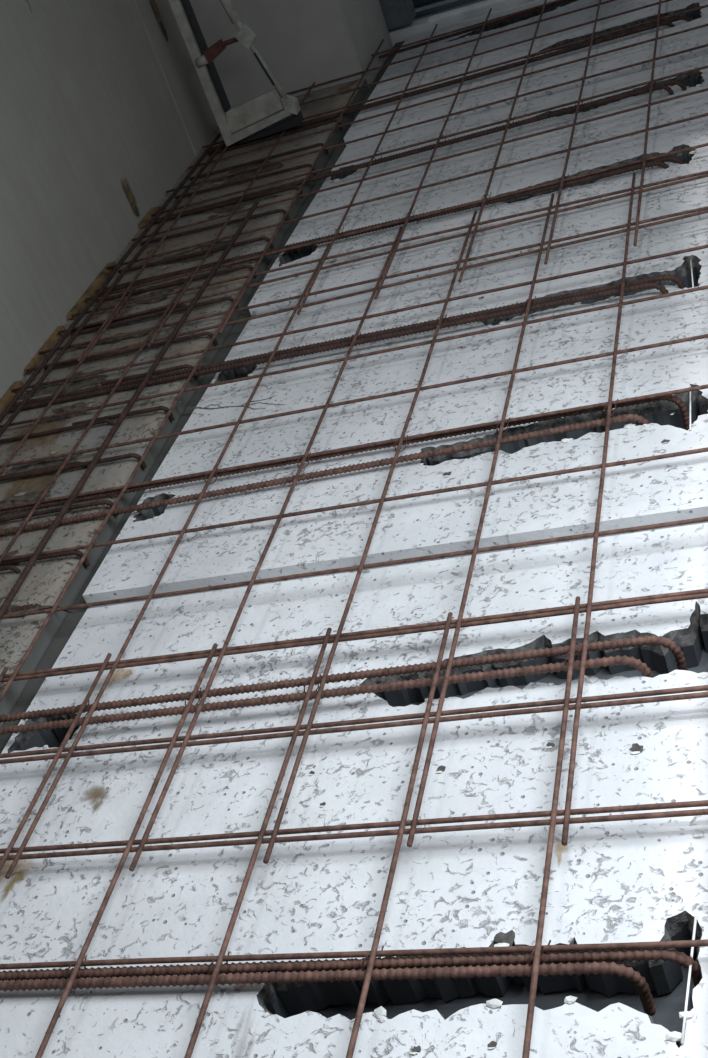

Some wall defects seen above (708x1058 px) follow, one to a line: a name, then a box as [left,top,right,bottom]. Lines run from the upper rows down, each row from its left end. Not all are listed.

spalling [445,0,578,43]
spalling [529,2,703,58]
spalling [531,70,705,118]
spalling [496,144,697,204]
spalling [480,255,702,327]
spalling [420,384,708,477]
spalling [132,493,176,522]
spalling [359,601,708,707]
spalling [8,713,80,753]
spalling [256,911,703,1048]